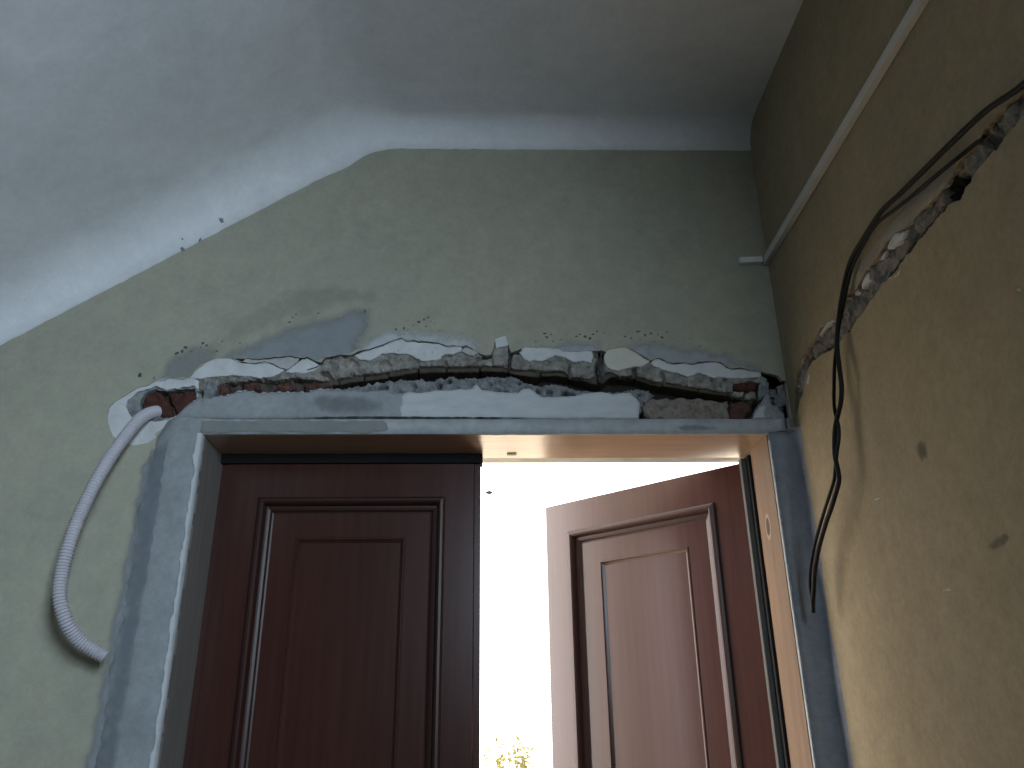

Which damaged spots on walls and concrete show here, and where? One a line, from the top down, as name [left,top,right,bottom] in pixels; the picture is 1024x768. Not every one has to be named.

peeling [881,230,910,260]
peeling [855,273,872,296]
crack [232,338,478,370]
spalling [108,317,786,445]